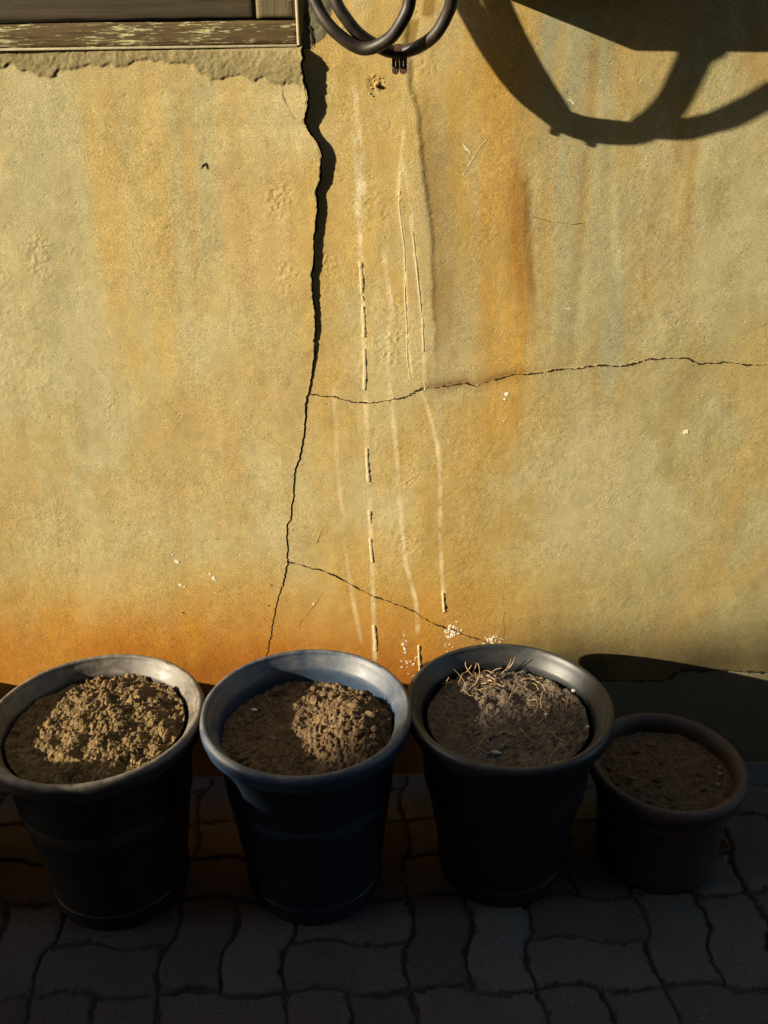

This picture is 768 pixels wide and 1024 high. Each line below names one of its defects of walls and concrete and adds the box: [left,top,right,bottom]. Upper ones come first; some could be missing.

leakage [330,82,378,663]
leakage [379,87,472,670]
rust [420,27,554,473]
crack [266,2,766,656]
rust [192,735,223,777]
rust [0,572,568,700]
leakage [441,604,768,762]